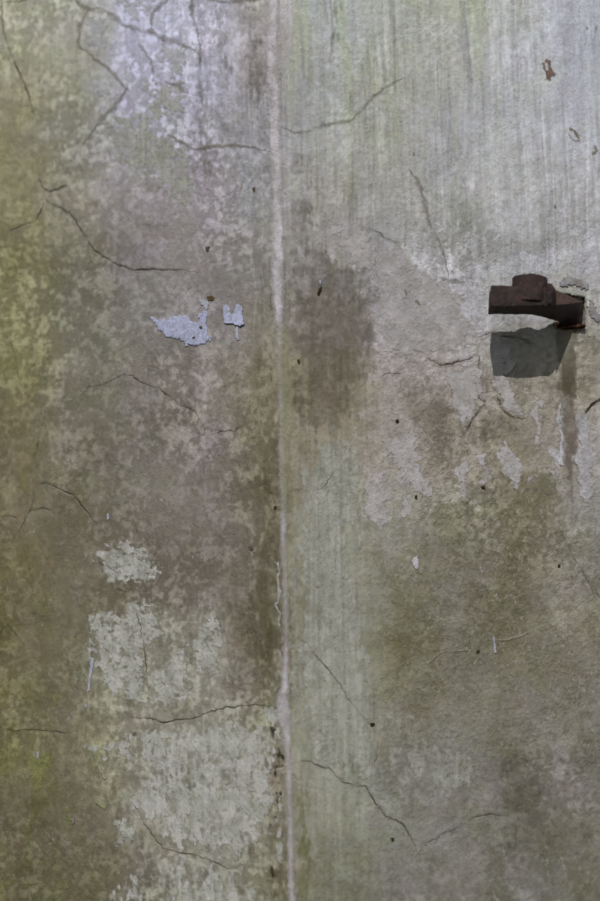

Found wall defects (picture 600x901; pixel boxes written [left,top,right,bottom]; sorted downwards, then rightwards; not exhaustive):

crack [0,0,36,117]
crack [170,135,263,150]
crack [10,179,198,273]
flaking render [453,441,538,498]
flaking render [447,337,560,478]
leakage [555,403,564,466]
leakage [575,414,595,502]
crack [301,741,502,851]